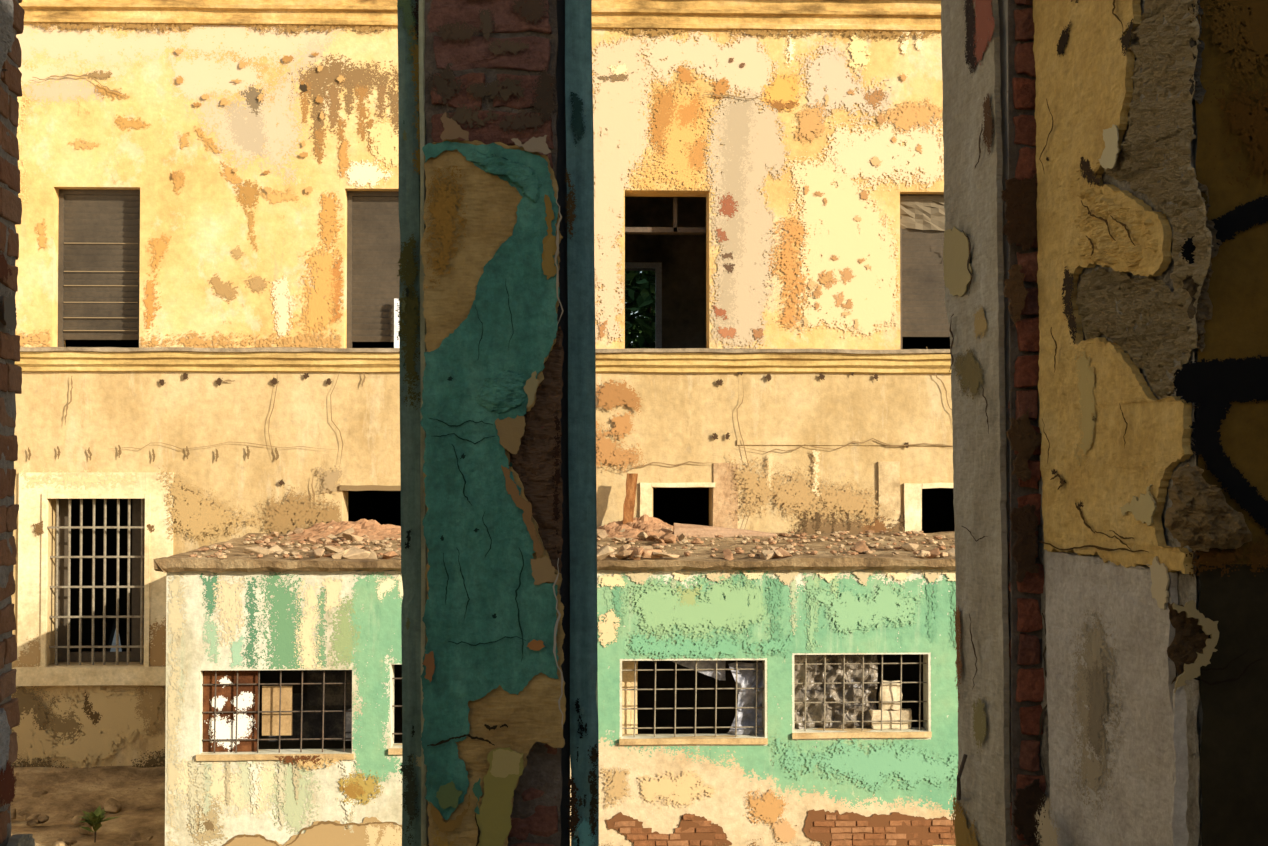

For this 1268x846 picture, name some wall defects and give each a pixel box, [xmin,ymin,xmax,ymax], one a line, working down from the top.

crack [1,69,126,96]
water stain [140,24,399,348]
peeling [570,29,944,349]
spalling [1061,0,1222,399]
peeling [0,572,190,846]
peeling [204,635,257,752]
water stain [200,572,361,669]
spalling [226,747,524,846]
water stain [375,575,403,602]
crack [429,416,564,729]
spalling [495,326,564,585]
spalling [1146,556,1219,693]